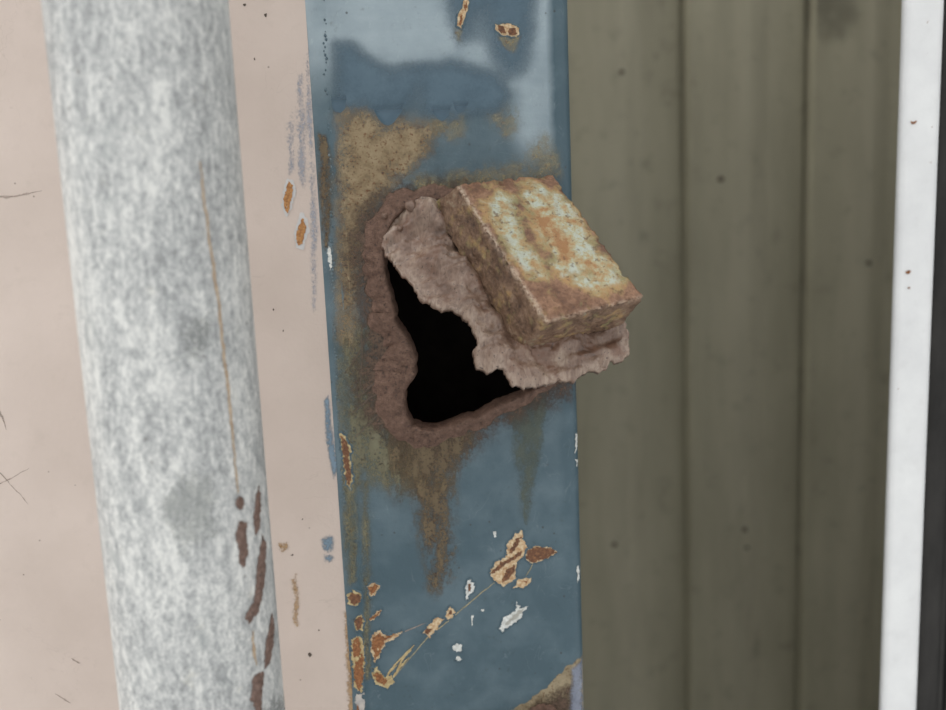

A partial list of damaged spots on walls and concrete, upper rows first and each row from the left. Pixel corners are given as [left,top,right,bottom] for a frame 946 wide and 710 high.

peeling [455,0,471,30]
peeling [494,22,521,39]
corrosion [318,111,575,678]
corrosion [199,161,275,710]
peeling [463,577,477,602]
peeling [488,528,559,634]
peeling [421,605,457,640]
peeling [345,581,414,710]
peeling [450,641,464,663]
peeling [514,656,583,710]
corrosion [534,687,572,710]